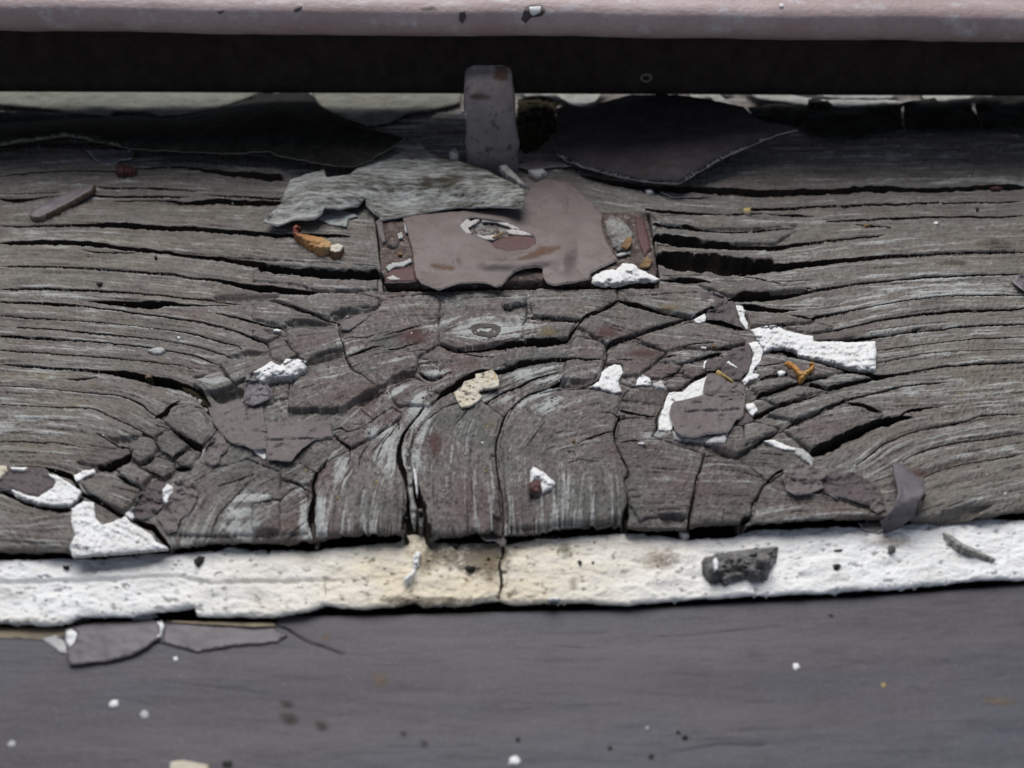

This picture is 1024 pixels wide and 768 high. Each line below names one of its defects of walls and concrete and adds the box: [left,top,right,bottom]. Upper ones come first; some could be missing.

peeling [263,142,618,291]
peeling [701,292,745,328]
peeling [203,372,332,466]
crack [0,166,1024,599]
peeling [669,346,754,438]
peeling [0,466,56,497]
peeling [134,478,199,533]
peeling [0,620,287,666]